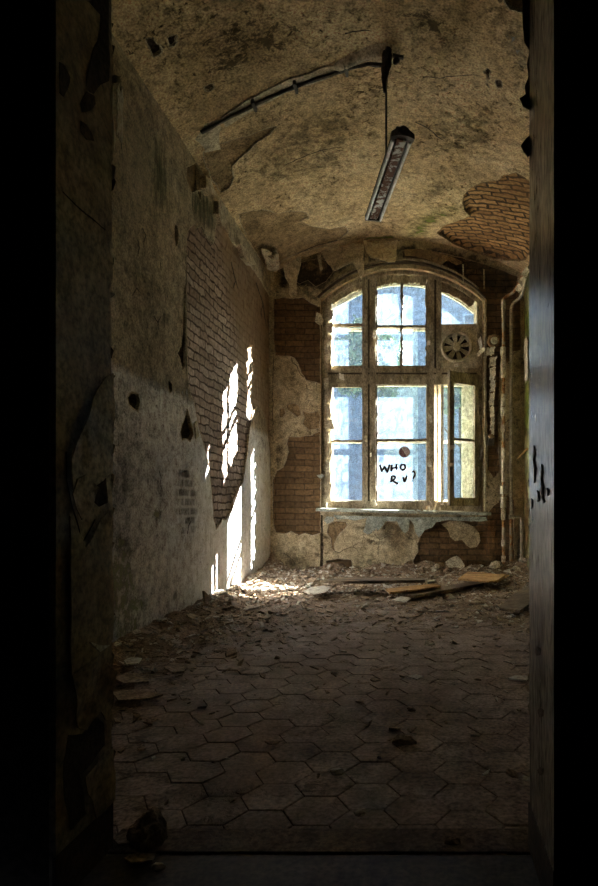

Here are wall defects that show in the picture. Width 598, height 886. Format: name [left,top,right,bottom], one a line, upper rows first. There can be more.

peeling [503,0,530,110]
flaking render [174,112,530,569]
flaking render [128,391,140,412]